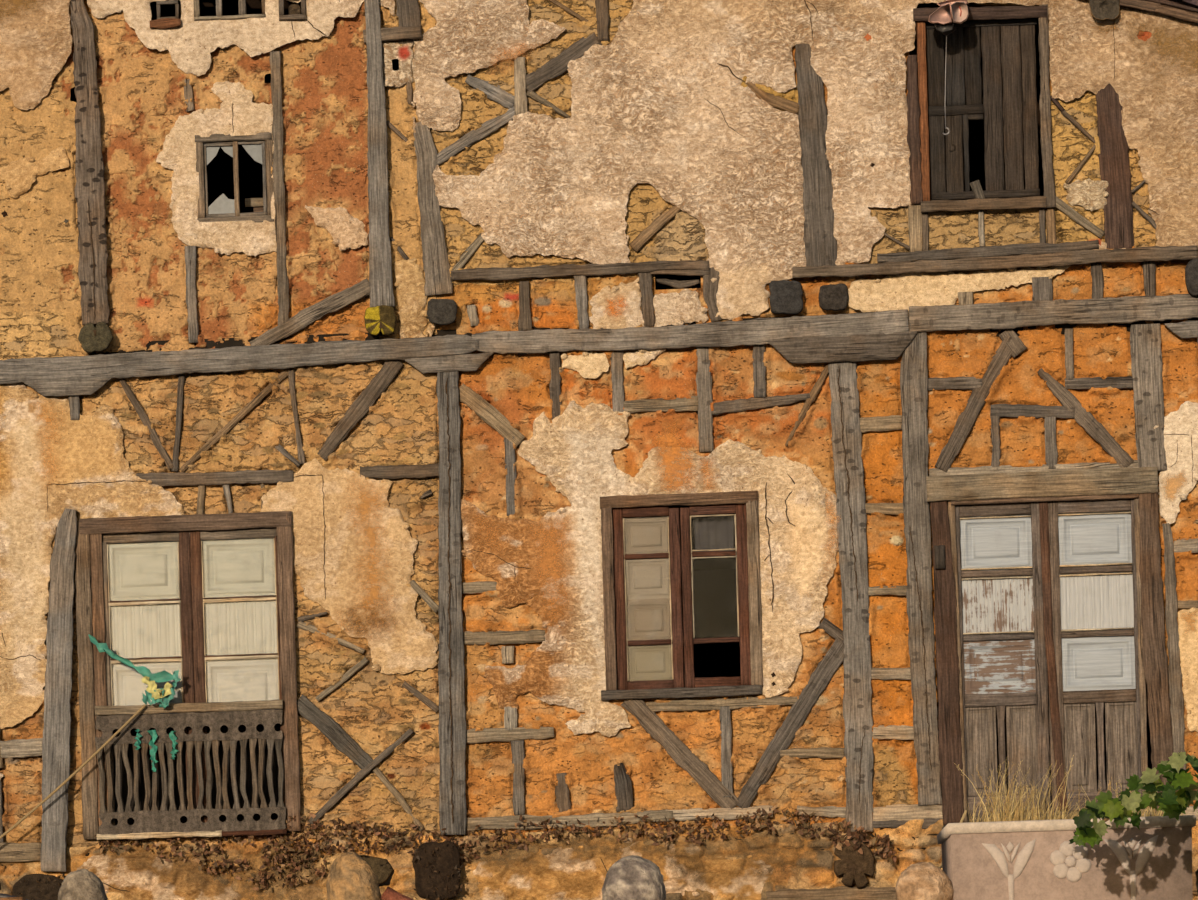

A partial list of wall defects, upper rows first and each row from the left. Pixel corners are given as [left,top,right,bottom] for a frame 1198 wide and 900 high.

spalling [432,0,633,176]
spalling [741,76,795,111]
spalling [0,0,438,360]
spalling [440,183,770,329]
flaking render [561,351,609,379]
flaking render [623,348,666,369]
flaking render [1154,401,1198,524]
flaking render [0,382,185,729]
flaking render [261,459,438,674]
flaking render [460,400,839,737]
flaking render [1177,607,1198,732]